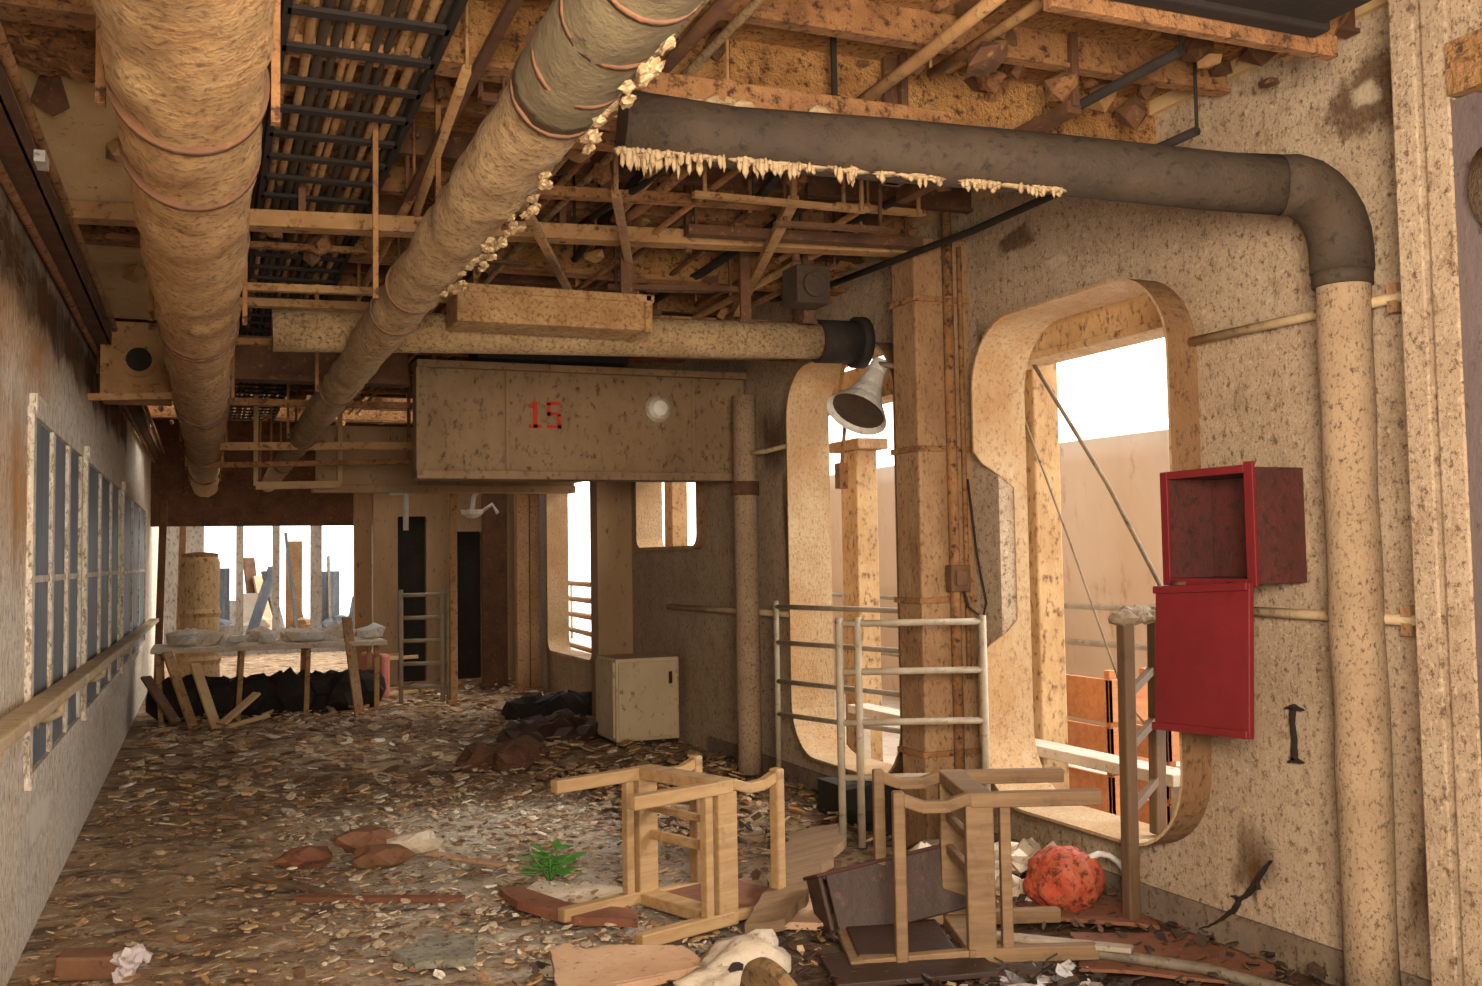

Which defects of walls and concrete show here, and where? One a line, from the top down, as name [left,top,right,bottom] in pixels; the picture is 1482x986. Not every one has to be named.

peeling [578,34,1067,198]
peeling [439,171,553,298]
peeling [1001,222,1032,252]
damp [0,203,127,449]
corrosion [15,467,27,522]